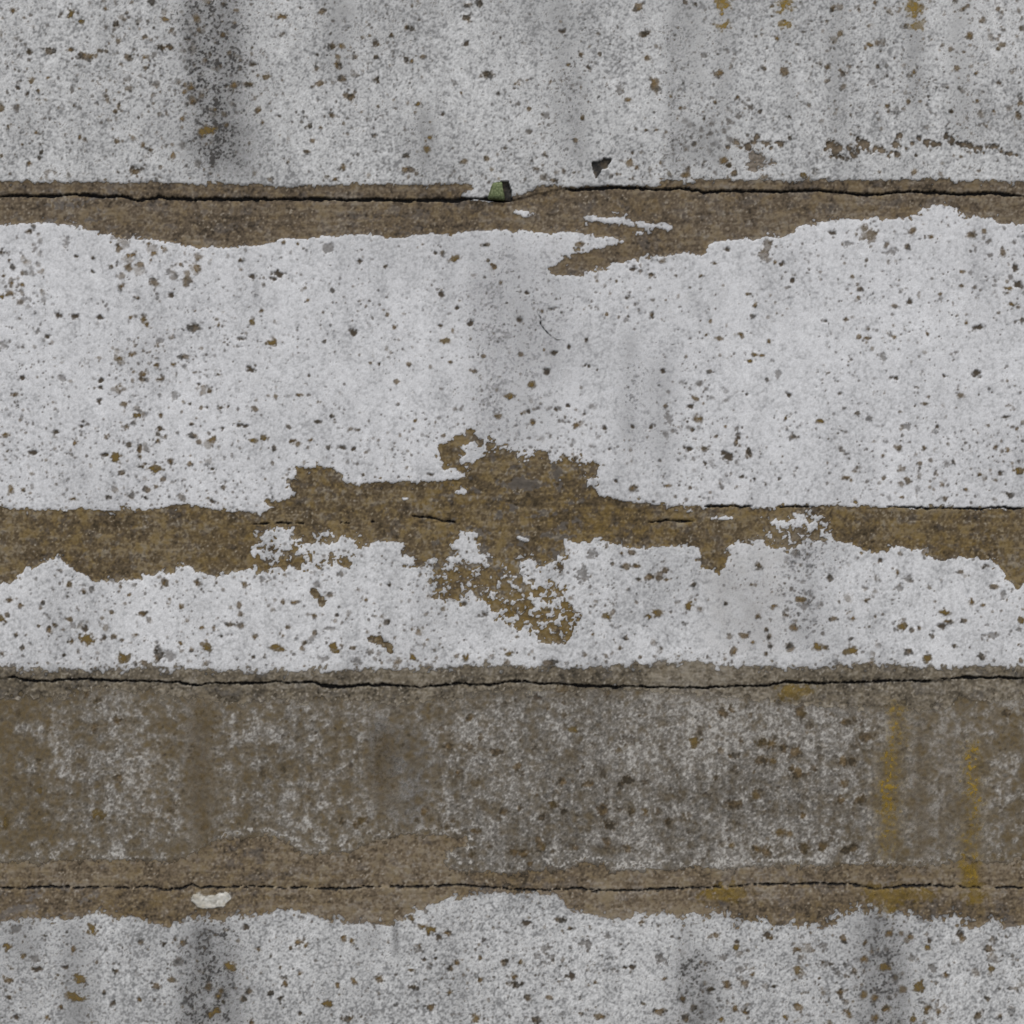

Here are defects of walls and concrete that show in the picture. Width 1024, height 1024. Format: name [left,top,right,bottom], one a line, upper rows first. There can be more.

crack [0,193,505,203]
peeling [0,132,1024,277]
crack [566,186,1020,197]
peeling [0,428,1024,645]
peeling [0,635,1024,714]
crack [9,675,1023,689]
peeling [0,830,1024,930]
crack [2,882,1022,893]